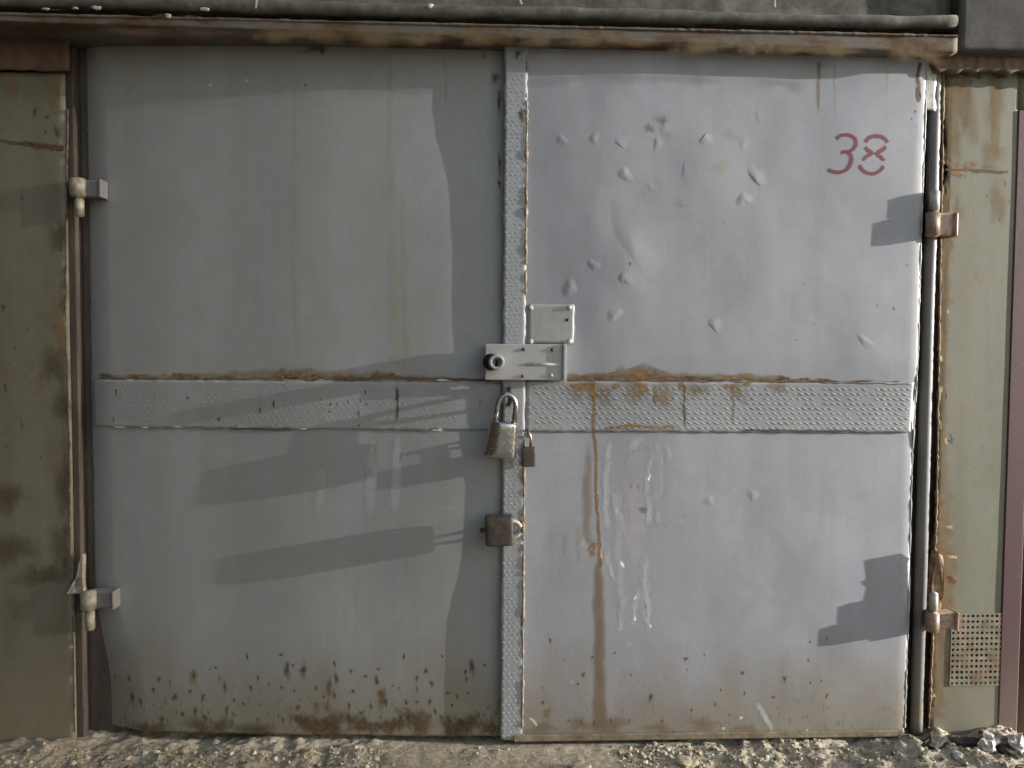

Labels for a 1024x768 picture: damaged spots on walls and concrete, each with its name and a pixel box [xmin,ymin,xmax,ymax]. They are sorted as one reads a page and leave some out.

corrosion [100,369,497,426]
corrosion [567,371,870,727]
corrosion [283,662,496,736]